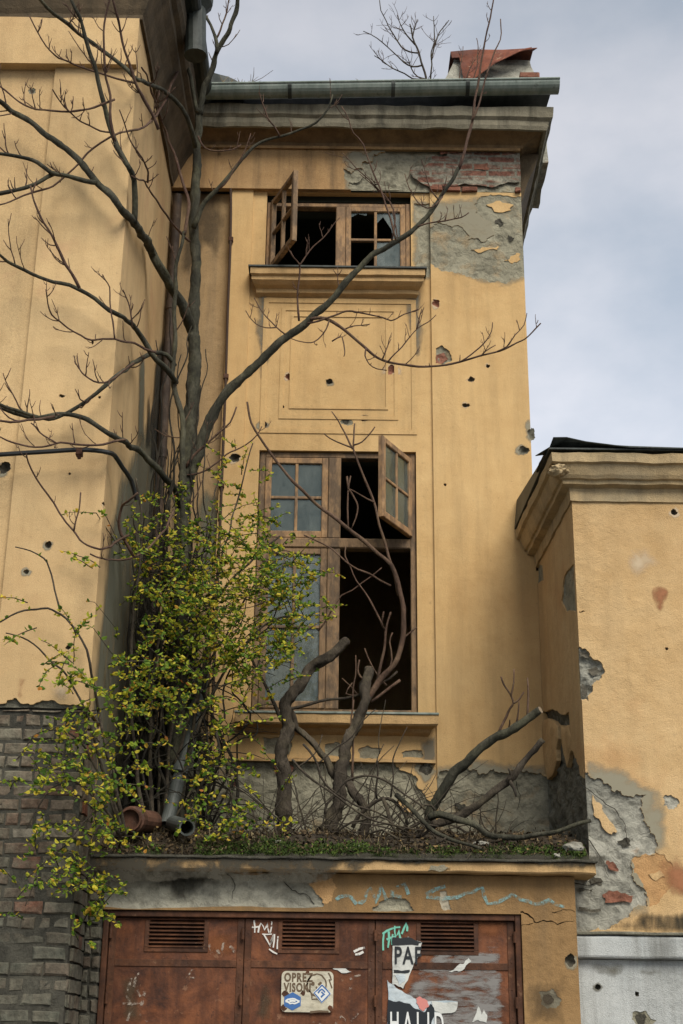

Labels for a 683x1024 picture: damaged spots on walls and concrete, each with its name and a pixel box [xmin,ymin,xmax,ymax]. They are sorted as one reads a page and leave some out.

flaking render [344,151,524,284]
water stain [257,297,265,350]
flaking render [436,346,452,364]
water stain [86,342,606,895]
flaking render [563,565,576,611]
water stain [653,587,667,609]
flaking render [579,648,605,701]
flaking render [545,710,570,726]
flaking render [663,795,679,810]
flaking render [189,737,673,932]
flaking render [101,872,337,909]
crack [520,910,571,925]